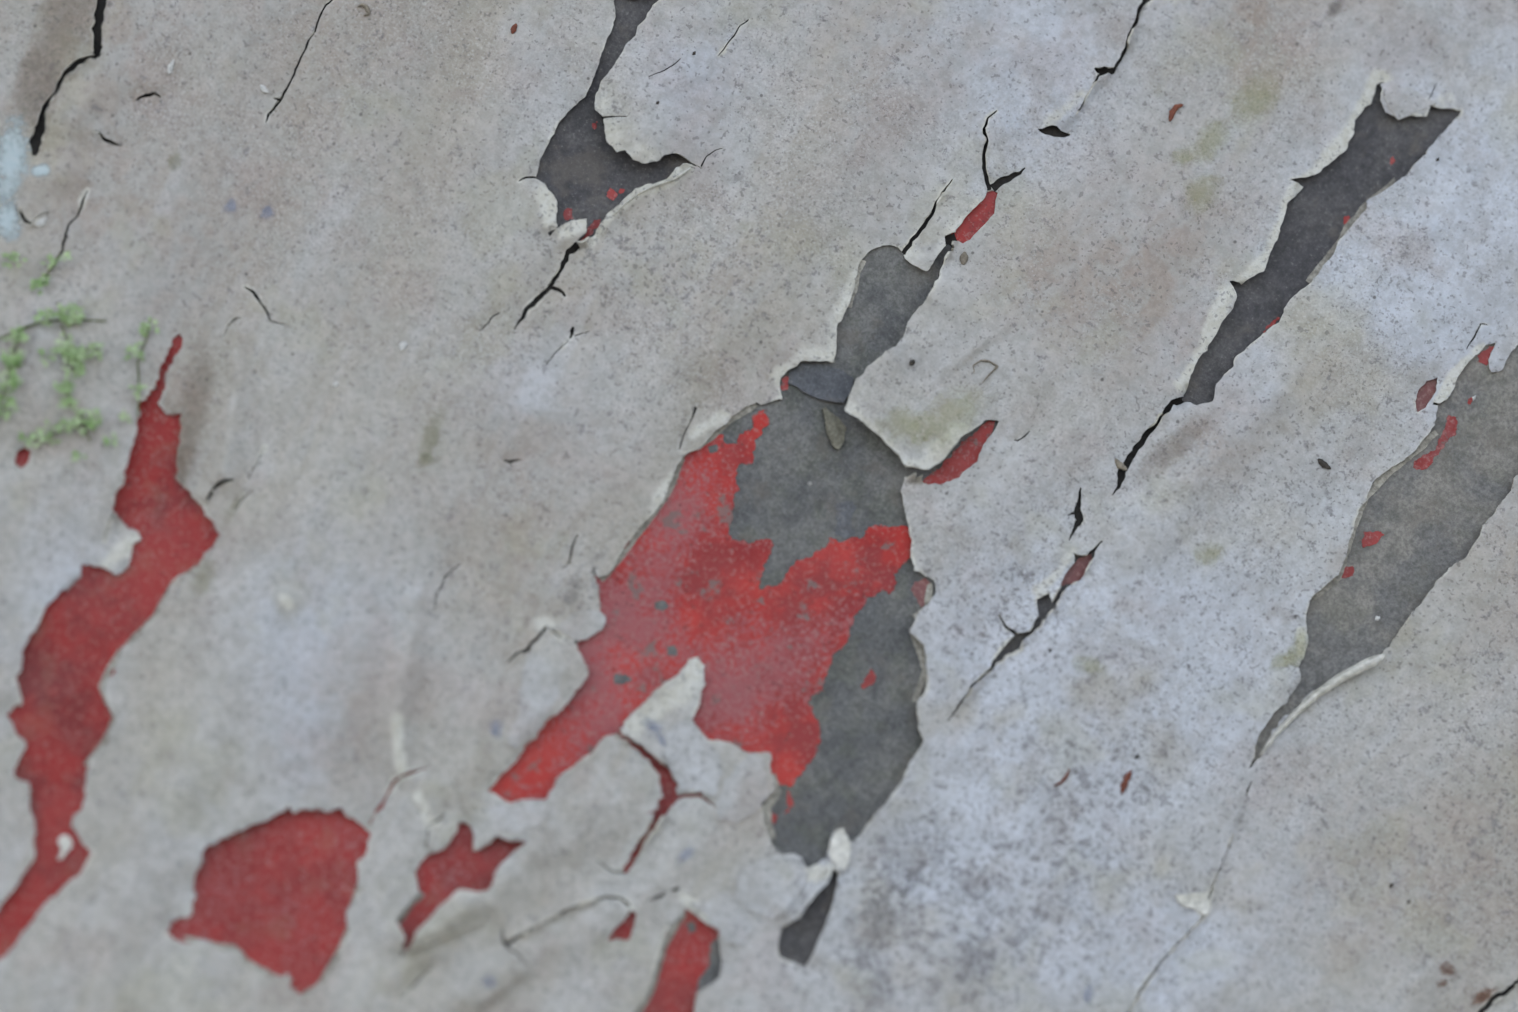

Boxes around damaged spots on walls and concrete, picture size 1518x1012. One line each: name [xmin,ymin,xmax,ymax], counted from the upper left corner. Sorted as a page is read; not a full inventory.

crack [29,0,107,156]
crack [94,130,121,146]
peeling [528,0,713,251]
crack [1038,0,1150,137]
crack [480,243,590,365]
peeling [1137,70,1461,459]
peeling [0,333,239,958]
peeling [396,184,1099,1012]
crack [947,616,1017,722]
peeling [1253,343,1518,762]
peeling [166,784,371,1003]
crack [1478,980,1518,1012]